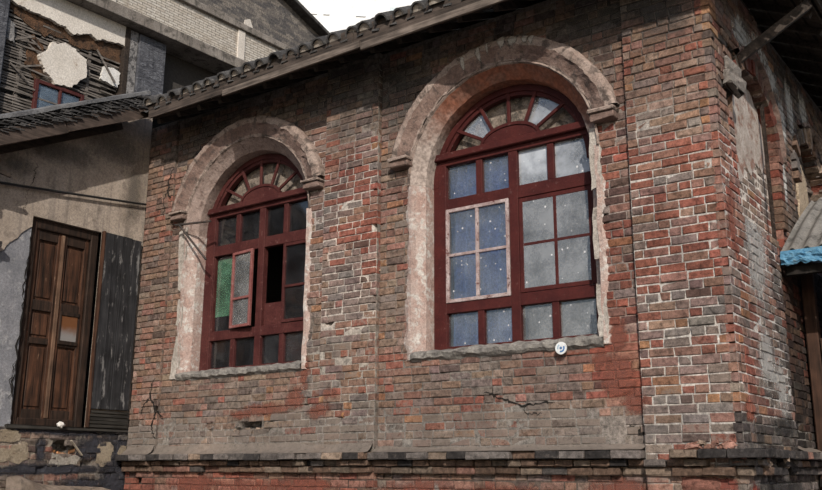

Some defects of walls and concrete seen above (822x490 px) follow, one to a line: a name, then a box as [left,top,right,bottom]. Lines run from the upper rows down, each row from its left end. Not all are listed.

flaking render [6,0,126,89]
crack [141,378,163,439]
crack [484,392,555,415]
flaking render [0,429,28,464]
flaking render [49,449,81,467]
flaking render [95,442,127,467]